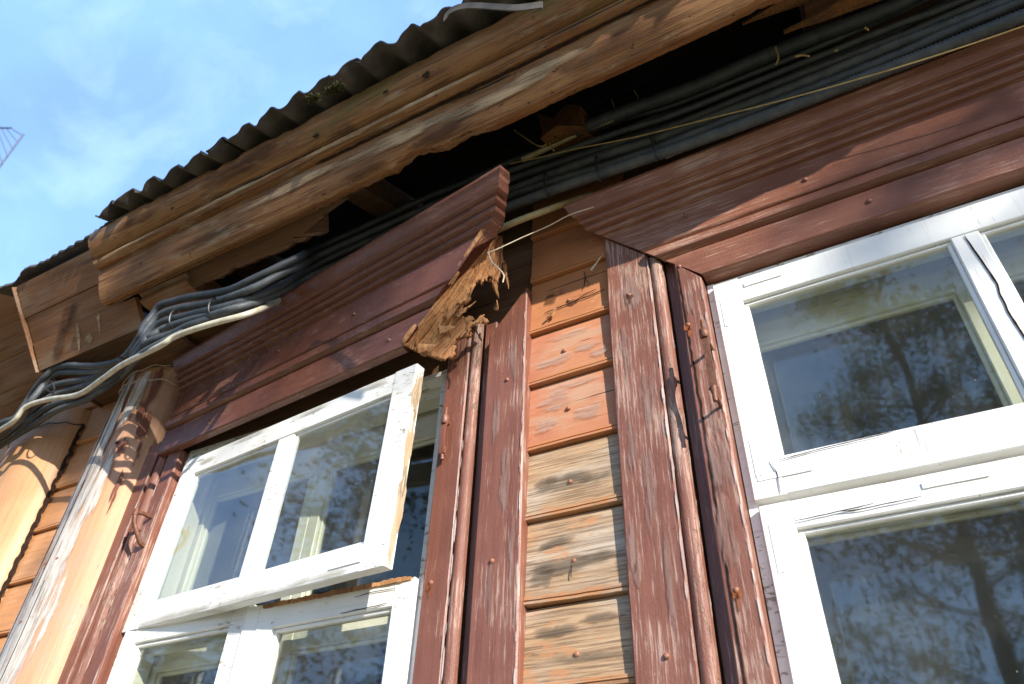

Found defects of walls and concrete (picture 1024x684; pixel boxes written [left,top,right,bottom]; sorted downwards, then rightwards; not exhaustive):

peeling [624,261,661,368]
peeling [0,367,163,684]
peeling [446,485,459,605]
peeling [499,451,521,512]
peeling [509,524,519,587]
peeling [628,523,642,586]
peeling [642,374,688,616]
peeling [707,399,755,583]